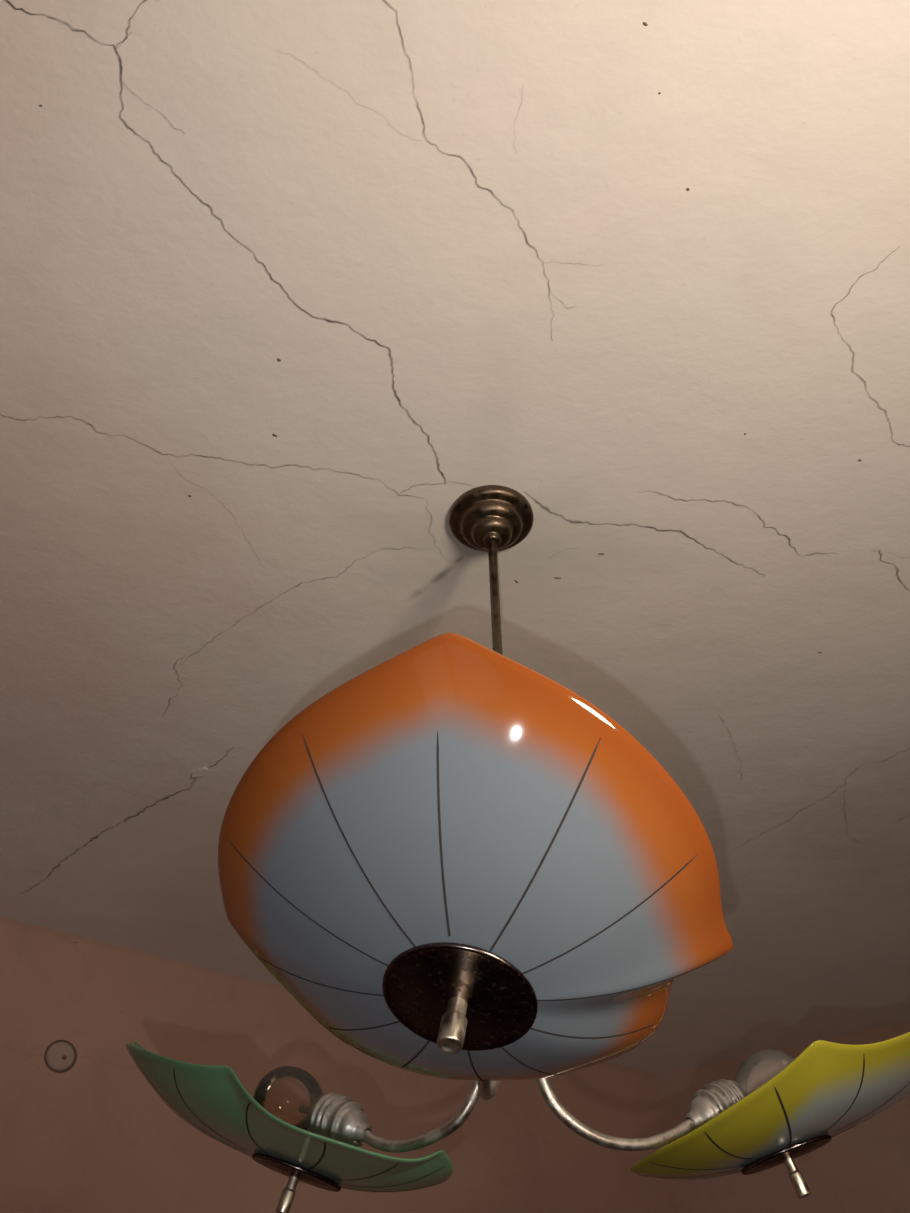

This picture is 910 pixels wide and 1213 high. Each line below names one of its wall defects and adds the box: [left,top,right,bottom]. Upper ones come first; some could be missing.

crack [6,0,233,237]
crack [258,261,446,484]